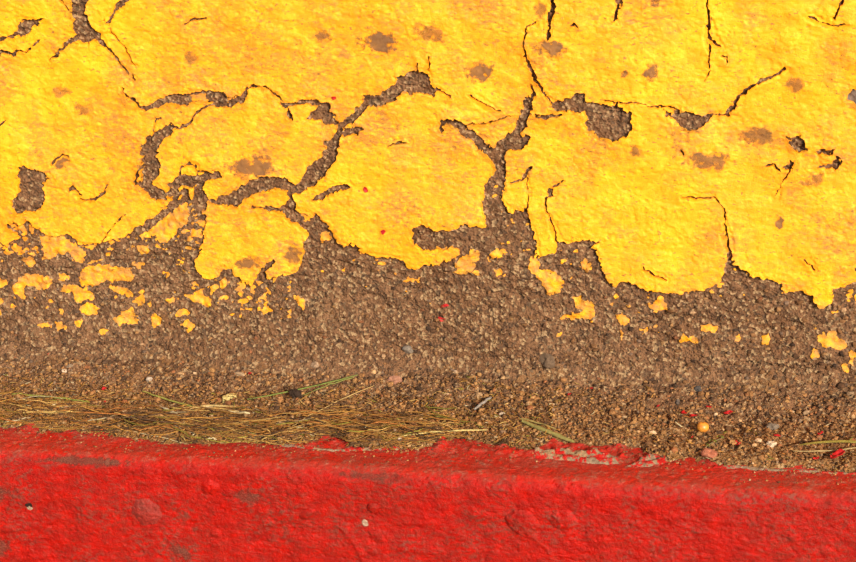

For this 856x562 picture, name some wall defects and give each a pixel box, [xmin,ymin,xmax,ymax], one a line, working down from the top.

crack [808,0,845,26]
crack [704,0,728,81]
crack [103,0,578,242]
peeling [551,93,651,142]
peeling [786,135,842,169]
crack [69,184,108,201]
crack [765,163,793,194]
crack [687,196,730,247]
crack [260,259,275,274]
peeling [0,165,856,398]